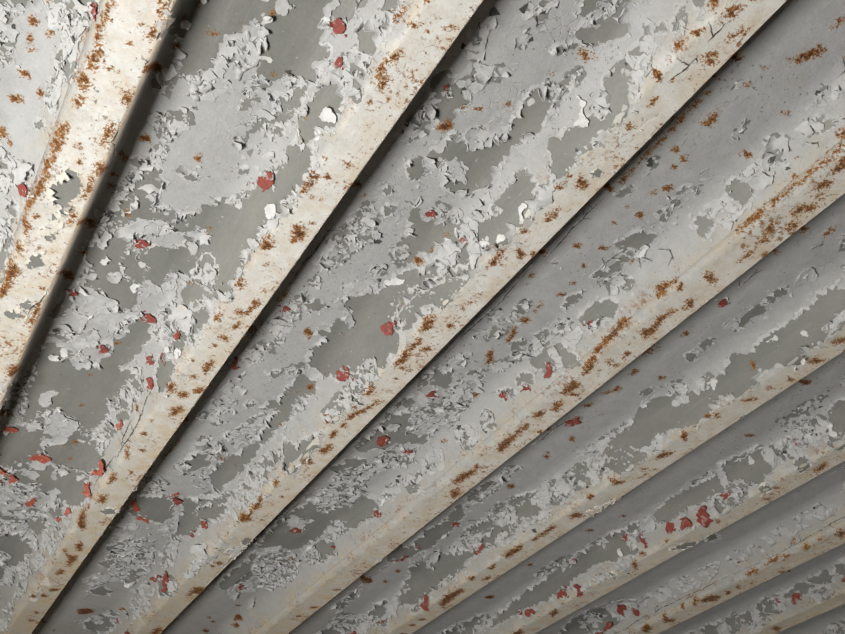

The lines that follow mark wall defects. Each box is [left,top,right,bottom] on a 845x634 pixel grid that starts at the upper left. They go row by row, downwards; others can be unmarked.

rust [65,211,98,228]
rust [94,121,116,146]
peeling [0,0,413,634]
peeling [81,0,708,625]
peeling [315,264,845,634]
peeling [793,73,845,139]